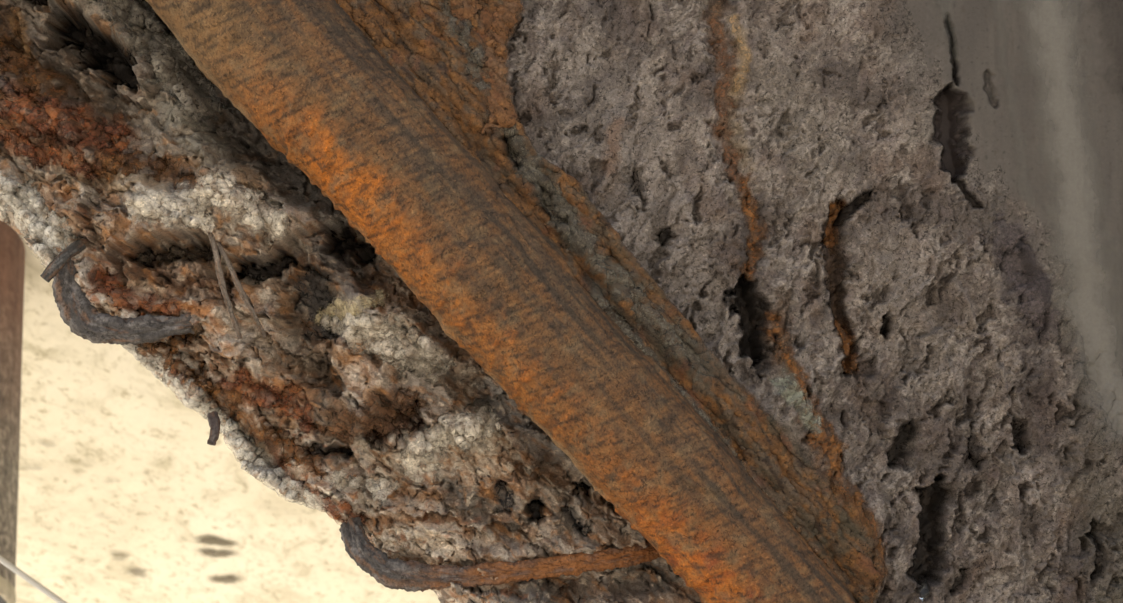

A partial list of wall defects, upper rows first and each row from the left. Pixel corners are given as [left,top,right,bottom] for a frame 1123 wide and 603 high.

corrosion [0,77,224,202]
crack [932,16,997,208]
corrosion [92,267,181,317]
spalling [0,0,702,603]
corrosion [335,0,887,603]
spalling [496,0,1123,603]
crack [820,192,872,374]
corrosion [134,323,424,526]